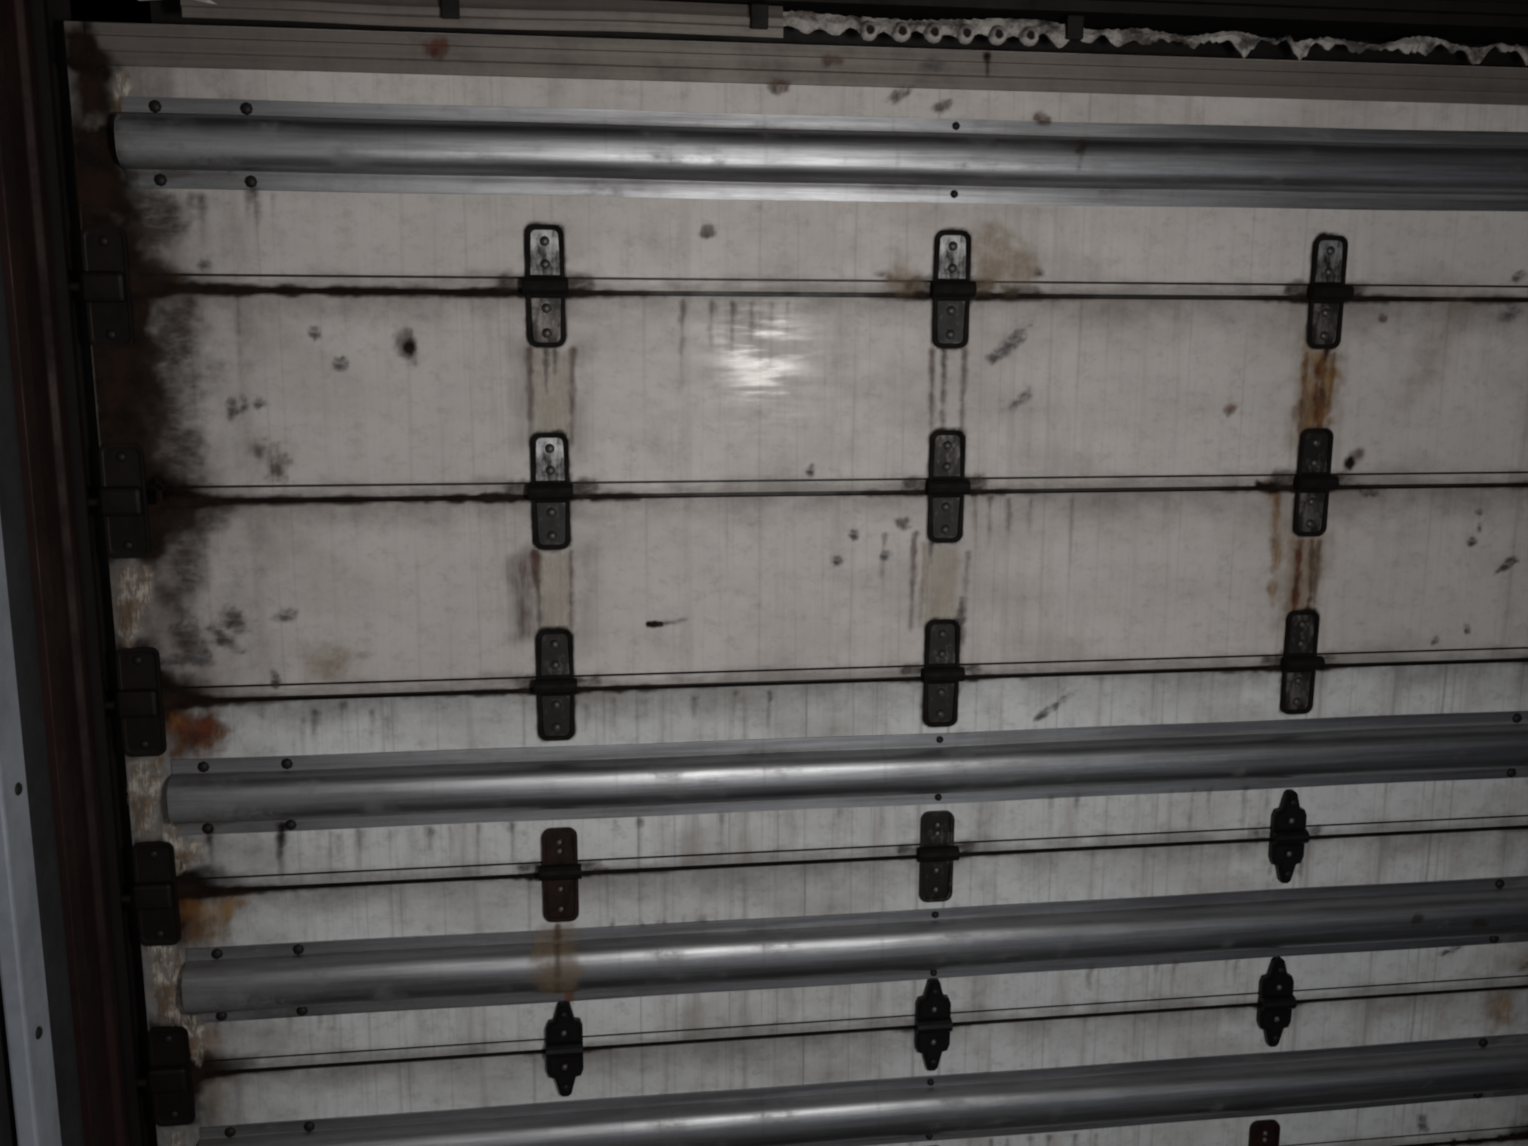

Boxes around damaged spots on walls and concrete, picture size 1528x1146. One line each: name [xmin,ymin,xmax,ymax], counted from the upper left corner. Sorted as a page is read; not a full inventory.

rust [1298,349,1337,428]
rust [1270,541,1320,610]
rust [171,715,227,755]